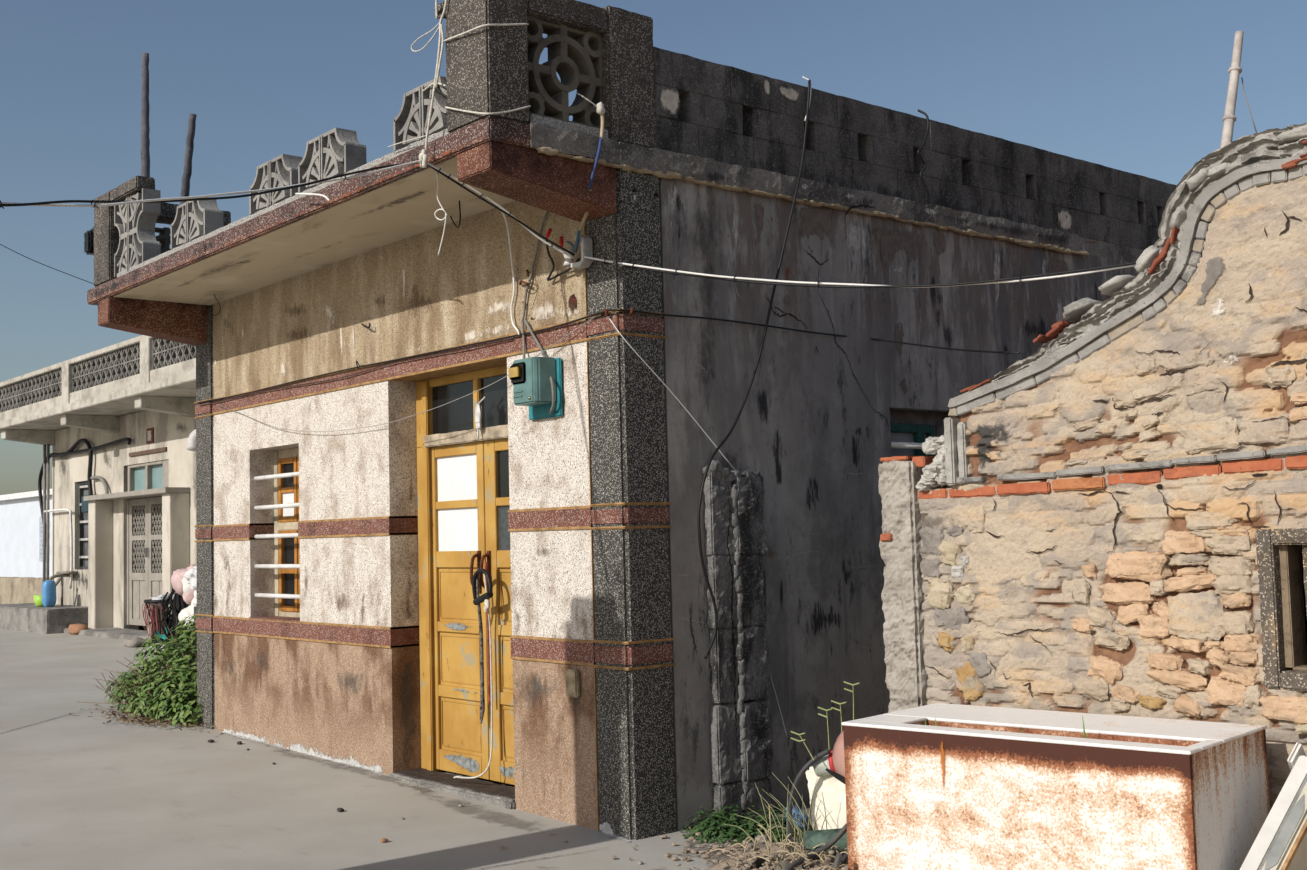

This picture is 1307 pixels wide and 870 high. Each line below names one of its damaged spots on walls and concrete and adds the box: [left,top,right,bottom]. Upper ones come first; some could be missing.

damp [818,174,1084,258]
crack [1264,211,1302,238]
damp [325,305,354,350]
damp [403,270,430,312]
damp [758,391,781,483]
crack [1092,345,1208,424]
crack [1218,358,1307,452]
crack [1078,480,1297,553]
damp [810,602,841,635]
spalling [919,506,992,702]
crack [1027,529,1096,635]
spalling [1072,511,1307,735]